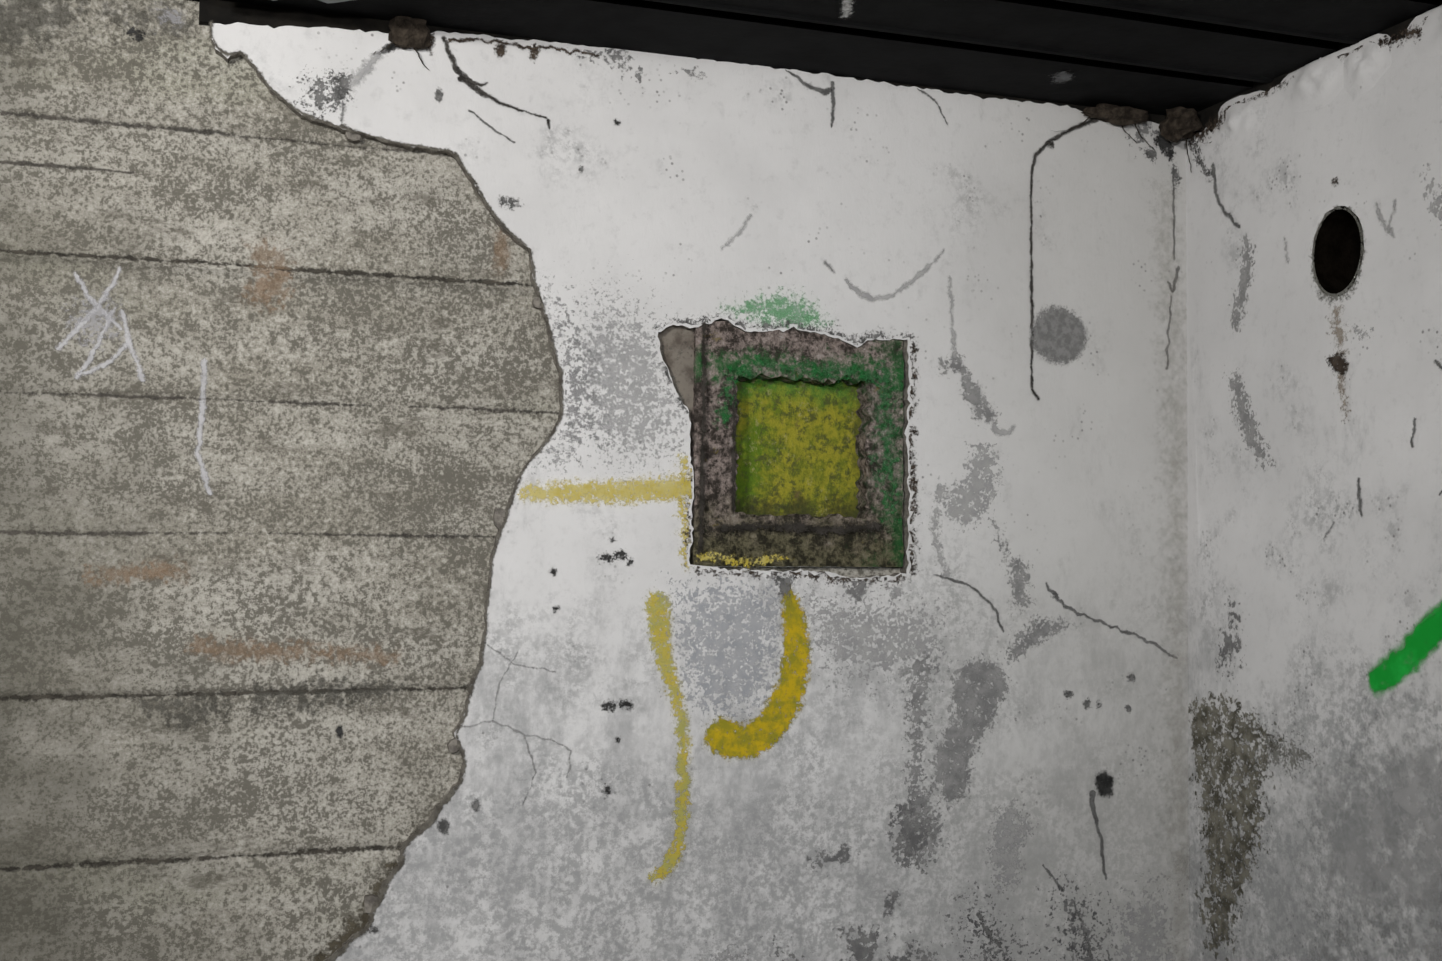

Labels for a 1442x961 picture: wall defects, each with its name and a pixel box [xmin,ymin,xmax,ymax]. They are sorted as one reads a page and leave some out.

crack [442,36,550,143]
spalling [425,33,643,83]
crack [824,250,944,300]
crack [1029,118,1099,400]
spalling [0,0,564,961]
crack [937,575,1004,632]
crack [1046,582,1177,659]
water stain [1188,596,1318,961]